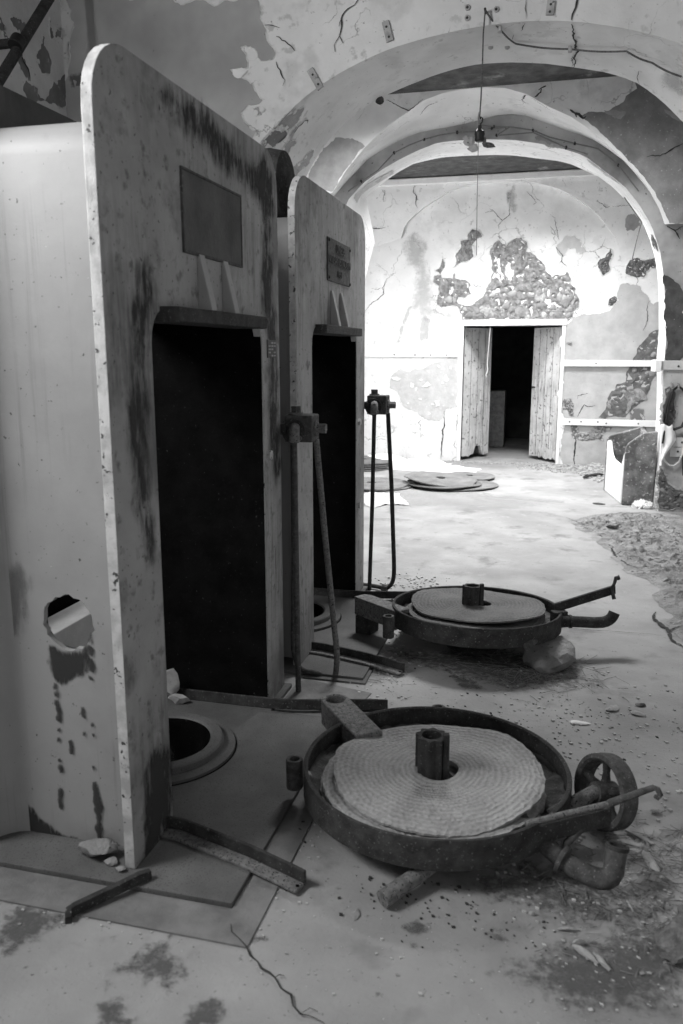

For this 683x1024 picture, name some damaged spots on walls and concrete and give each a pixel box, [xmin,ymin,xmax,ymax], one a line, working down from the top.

crack [571,0,579,67]
flaking render [0,0,365,192]
crack [496,192,565,265]
peeling [433,228,683,466]
water stain [117,944,182,987]
crack [231,926,324,1023]